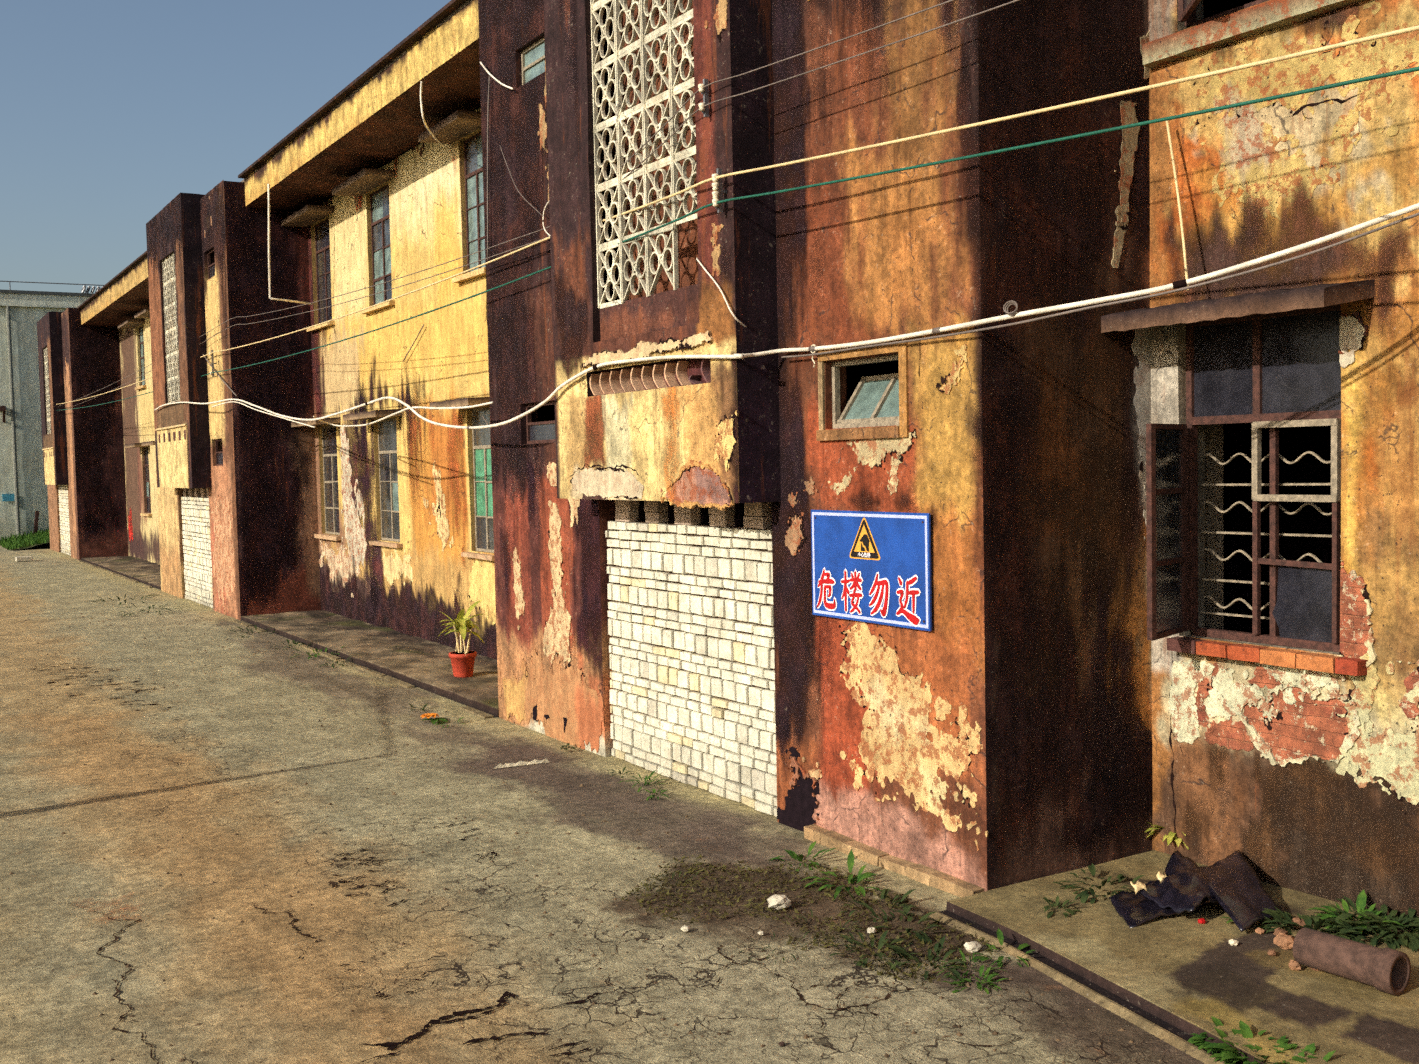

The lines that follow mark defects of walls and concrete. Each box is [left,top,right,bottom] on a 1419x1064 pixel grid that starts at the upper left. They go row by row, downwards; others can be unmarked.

damp [200,182,332,611]
peeling [319,424,413,598]
damp [479,0,612,514]
peeling [497,409,739,752]
damp [771,0,815,753]
peeling [838,621,988,851]
damp [956,0,1407,863]
spalling [1168,560,1419,814]
crack [95,911,194,1064]
crack [253,904,318,959]
crack [362,991,600,1062]
crack [710,945,951,1032]